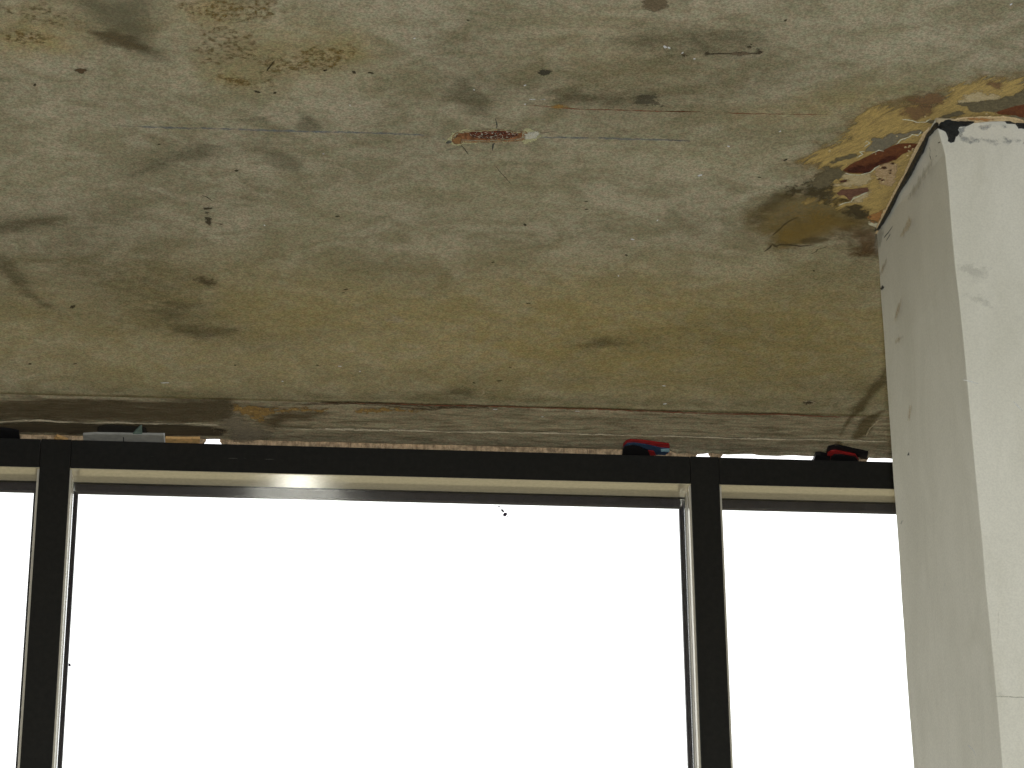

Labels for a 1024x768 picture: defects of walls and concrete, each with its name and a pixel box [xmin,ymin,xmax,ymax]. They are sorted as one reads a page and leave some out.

peeling [783,74,1024,234]
water stain [750,195,877,255]
water stain [0,399,233,436]